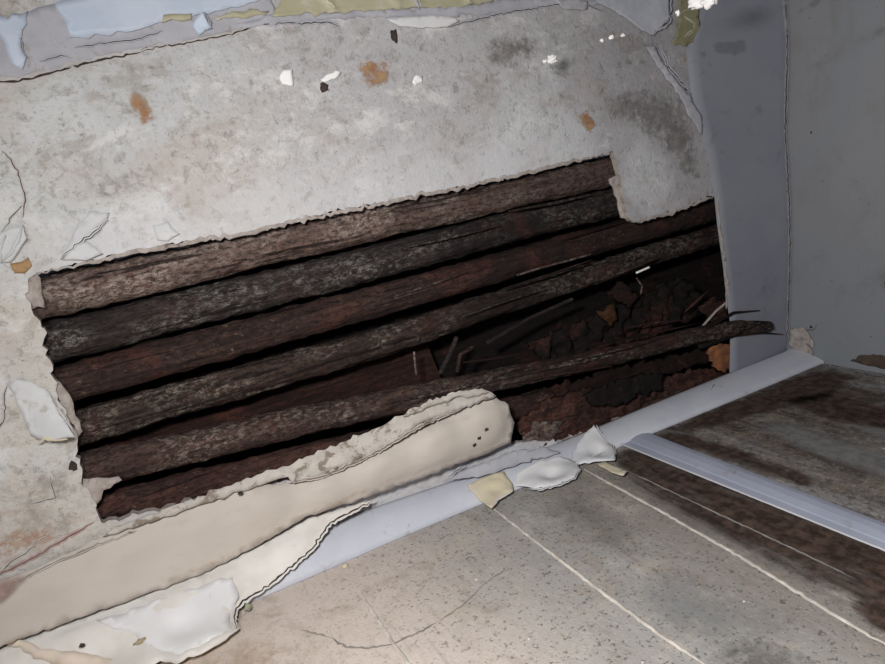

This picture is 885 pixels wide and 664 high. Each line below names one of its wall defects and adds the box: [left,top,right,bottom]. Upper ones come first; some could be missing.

rust [131,95,152,123]
peeling [0,0,701,78]
rust [360,62,387,87]
crack [1,151,28,233]
spalling [0,151,612,309]
spalling [608,175,729,309]
spalling [83,476,122,504]
peeling [446,425,627,509]
damp [659,371,885,486]
damp [615,450,885,630]
peeling [0,502,370,664]
crack [302,568,510,649]